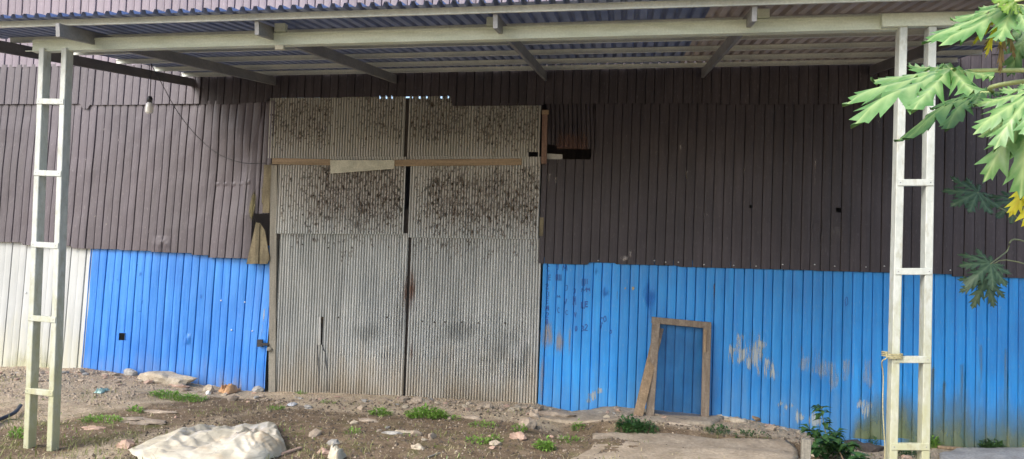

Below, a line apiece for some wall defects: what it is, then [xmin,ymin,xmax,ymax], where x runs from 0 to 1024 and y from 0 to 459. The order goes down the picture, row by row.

peeling [728,334,775,379]